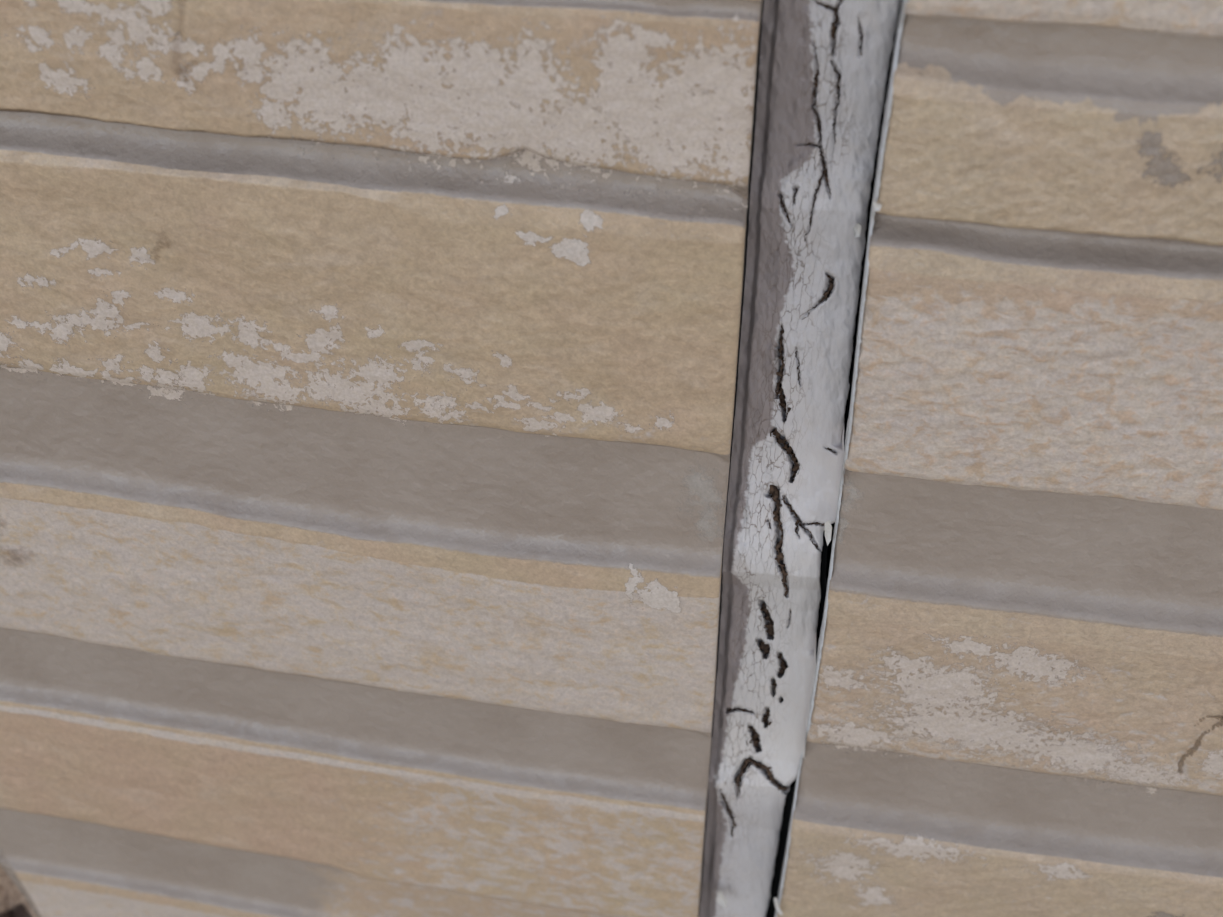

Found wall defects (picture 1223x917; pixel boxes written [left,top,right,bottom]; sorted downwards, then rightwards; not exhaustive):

peeling [15,0,758,222]
crack [781,0,863,242]
peeling [0,238,675,437]
crack [775,274,834,396]
crack [768,485,825,627]
crack [727,706,754,714]
crack [720,758,789,837]
crack [1178,715,1223,773]